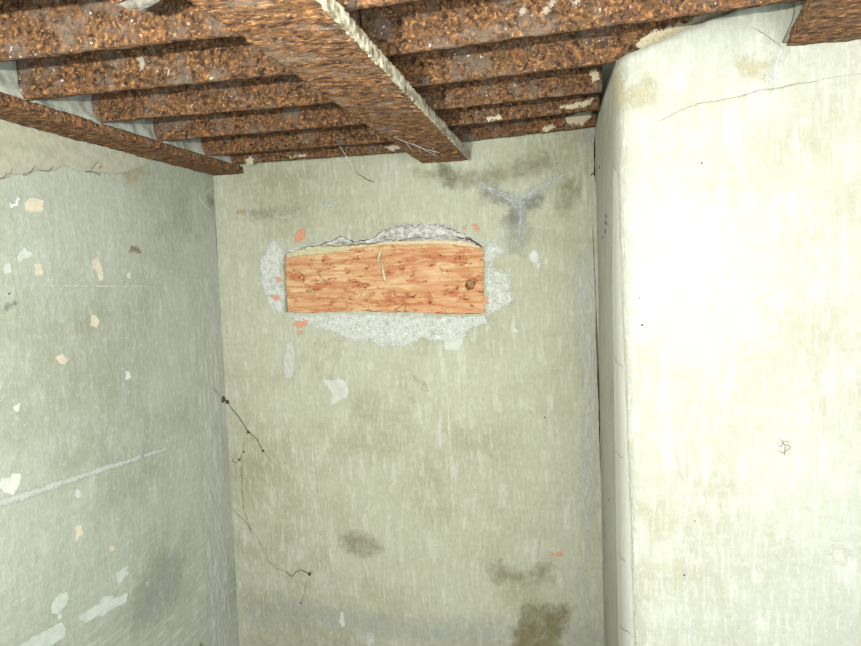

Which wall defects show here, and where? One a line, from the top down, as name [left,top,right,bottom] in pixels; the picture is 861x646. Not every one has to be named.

crack [656,73,861,122]
peeling [260,223,515,351]
peeling [21,592,69,646]
peeling [78,593,128,623]
damp [514,606,567,646]